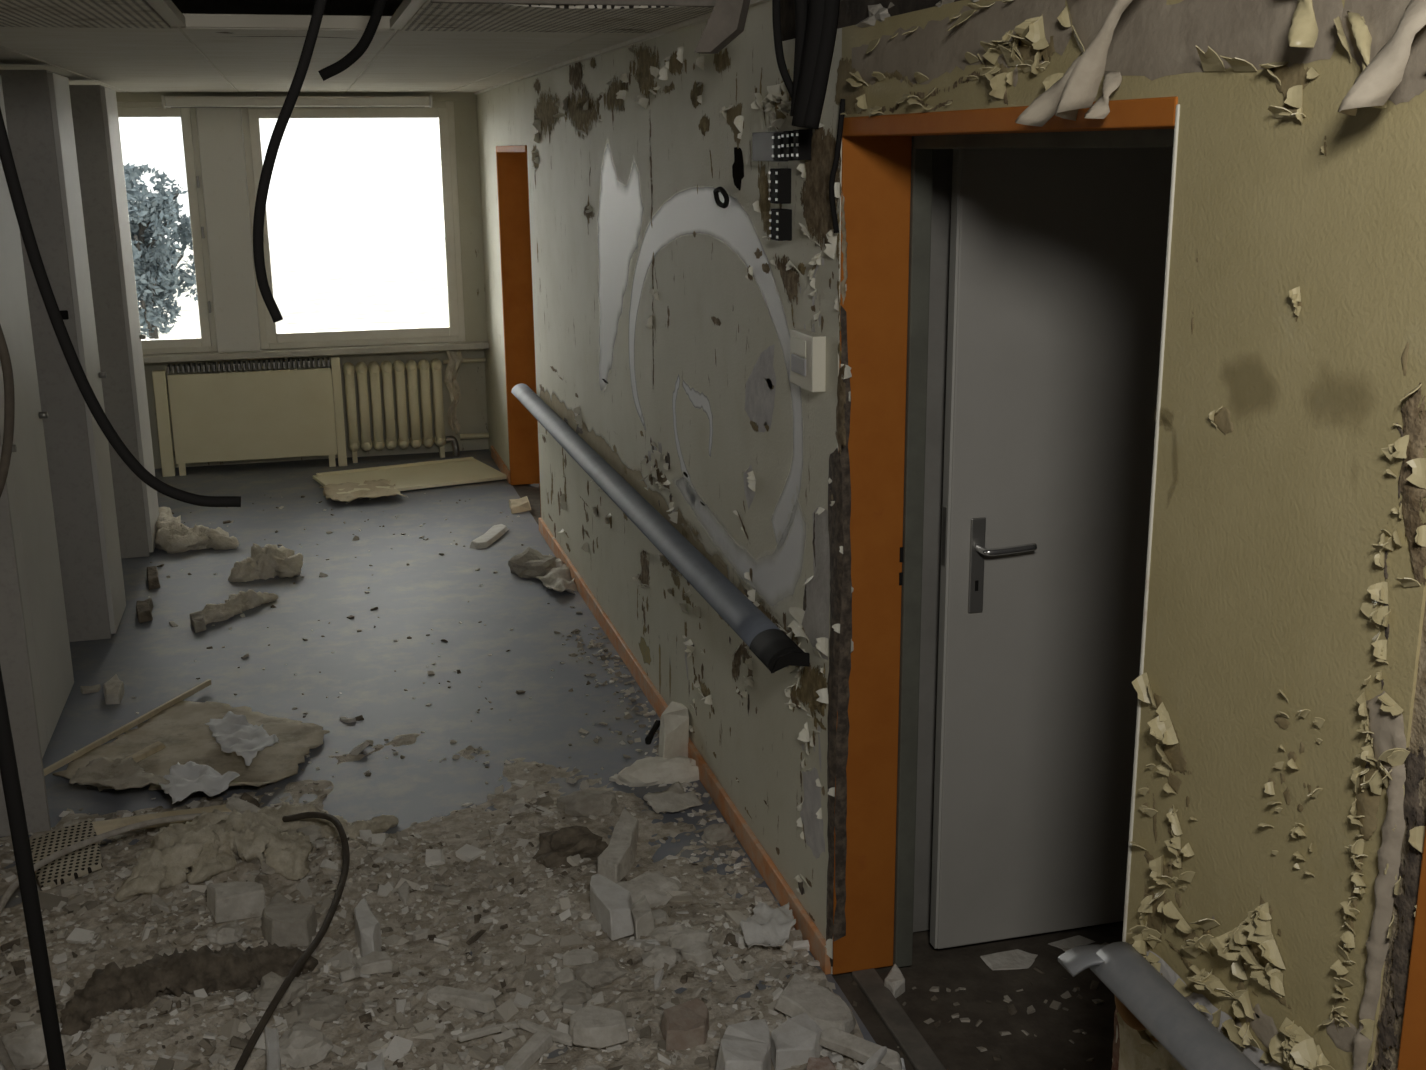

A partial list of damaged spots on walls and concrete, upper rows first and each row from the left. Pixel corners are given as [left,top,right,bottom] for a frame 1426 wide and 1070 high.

peeling [834,0,1426,127]
peeling [1288,286,1302,322]
spalling [531,29,854,967]
spalling [1396,342,1426,587]
spalling [1127,672,1426,1070]
spalling [1111,1008,1186,1070]